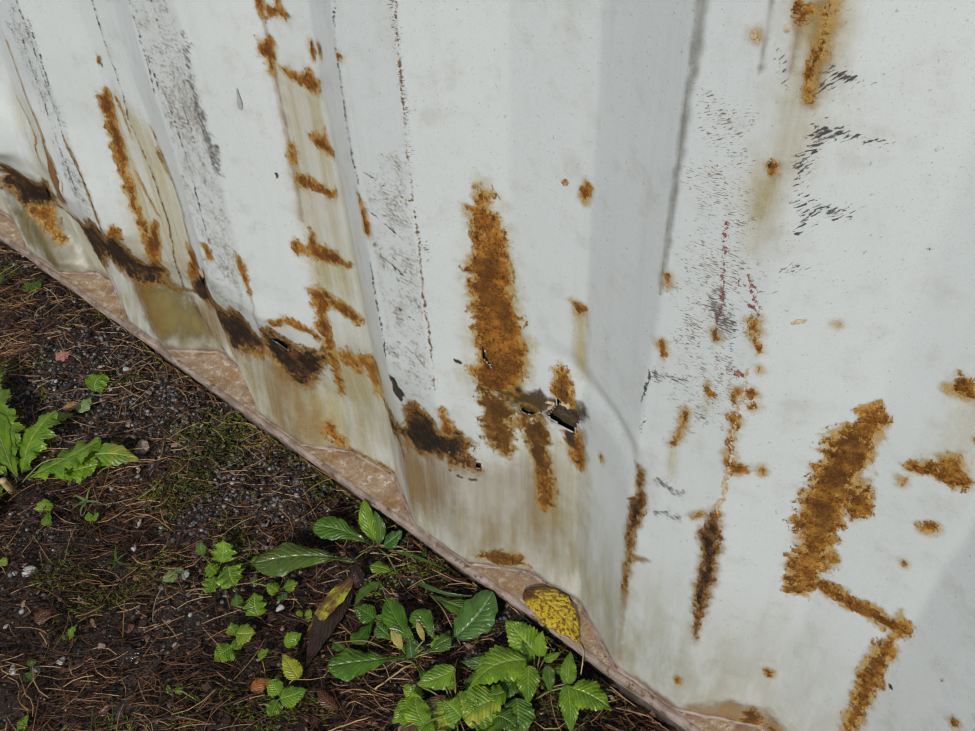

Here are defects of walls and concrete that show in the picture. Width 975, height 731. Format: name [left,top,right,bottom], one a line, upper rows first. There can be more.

corrosion [253,0,321,95]
corrosion [790,0,840,105]
corrosion [0,40,585,513]
corrosion [571,300,588,369]
corrosion [744,314,763,354]
corrosion [942,370,975,401]
corrosion [621,465,647,594]
corrosion [689,367,767,640]
corrosion [780,400,917,731]
corrosion [897,450,975,493]